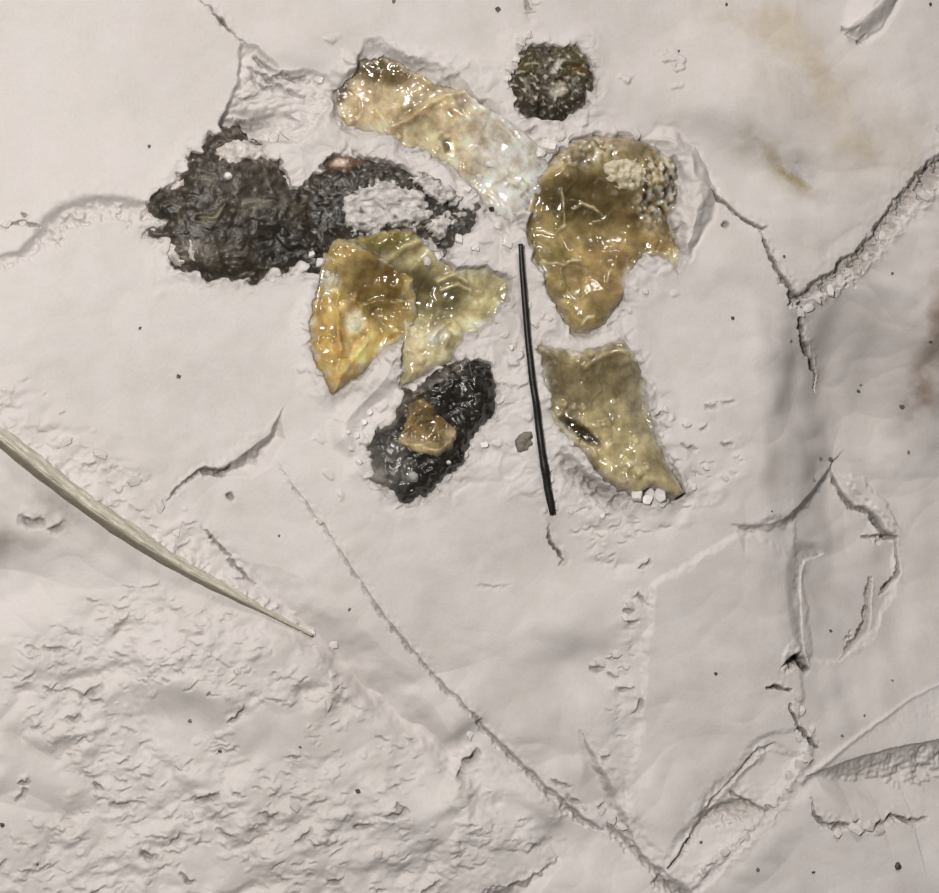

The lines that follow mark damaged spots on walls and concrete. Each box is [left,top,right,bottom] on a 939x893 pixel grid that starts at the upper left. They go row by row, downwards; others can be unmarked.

crack [199,0,246,44]
peeling [168,239,195,266]
peeling [215,139,268,163]
crack [707,129,939,393]
spalling [0,370,261,594]
spalling [515,431,533,452]
spalling [0,583,573,893]
crack [166,407,902,893]
spalling [577,438,752,773]
crack [810,797,929,839]